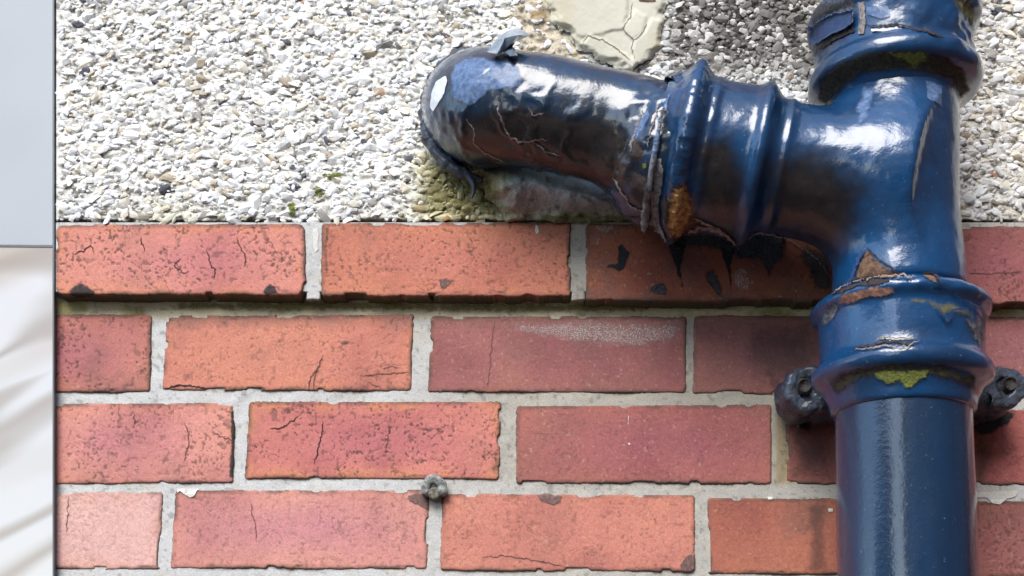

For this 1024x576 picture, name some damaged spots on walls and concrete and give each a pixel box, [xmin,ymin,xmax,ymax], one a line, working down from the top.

crack [559,3,654,70]
damp [520,321,674,346]
crack [308,356,323,390]